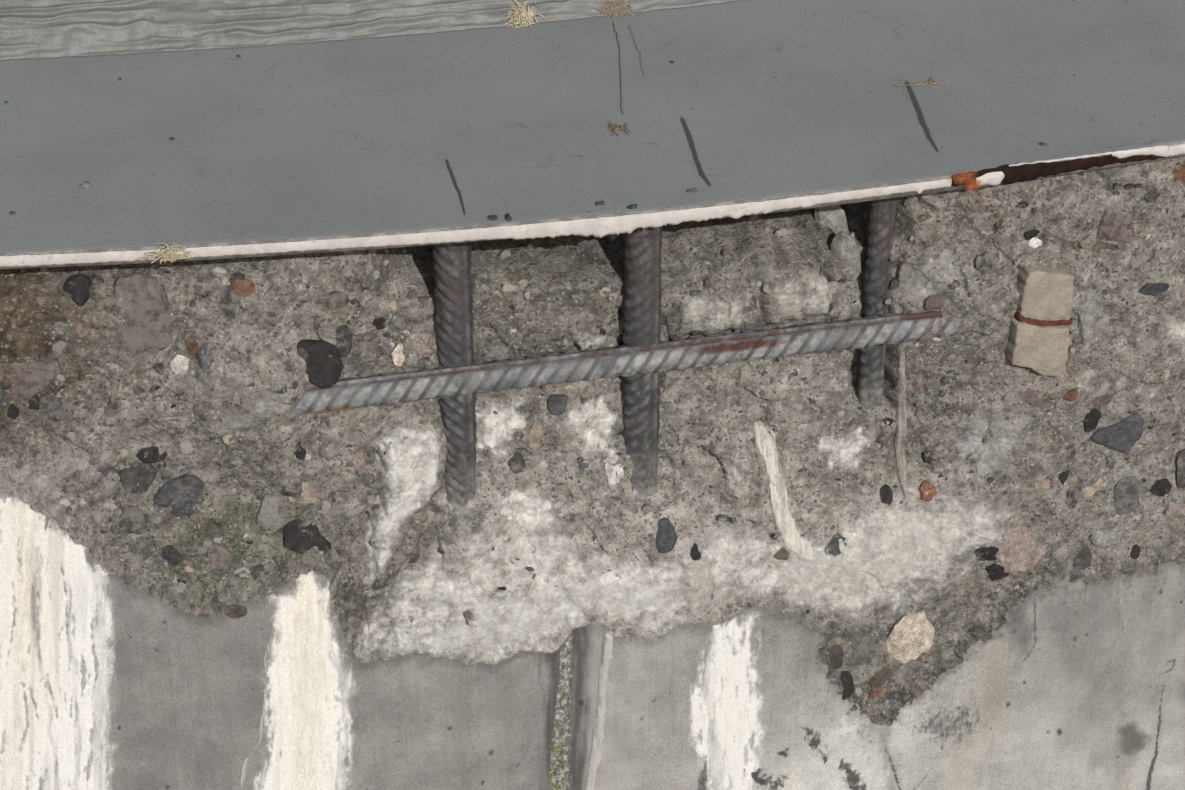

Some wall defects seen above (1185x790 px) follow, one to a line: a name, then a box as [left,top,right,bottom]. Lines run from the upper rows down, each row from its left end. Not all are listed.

corrosion [954,172,979,190]
water stain [0,497,114,790]
water stain [241,571,355,790]
spalling [0,145,1185,726]
water stain [363,352,1016,790]
crack [1146,660,1175,790]